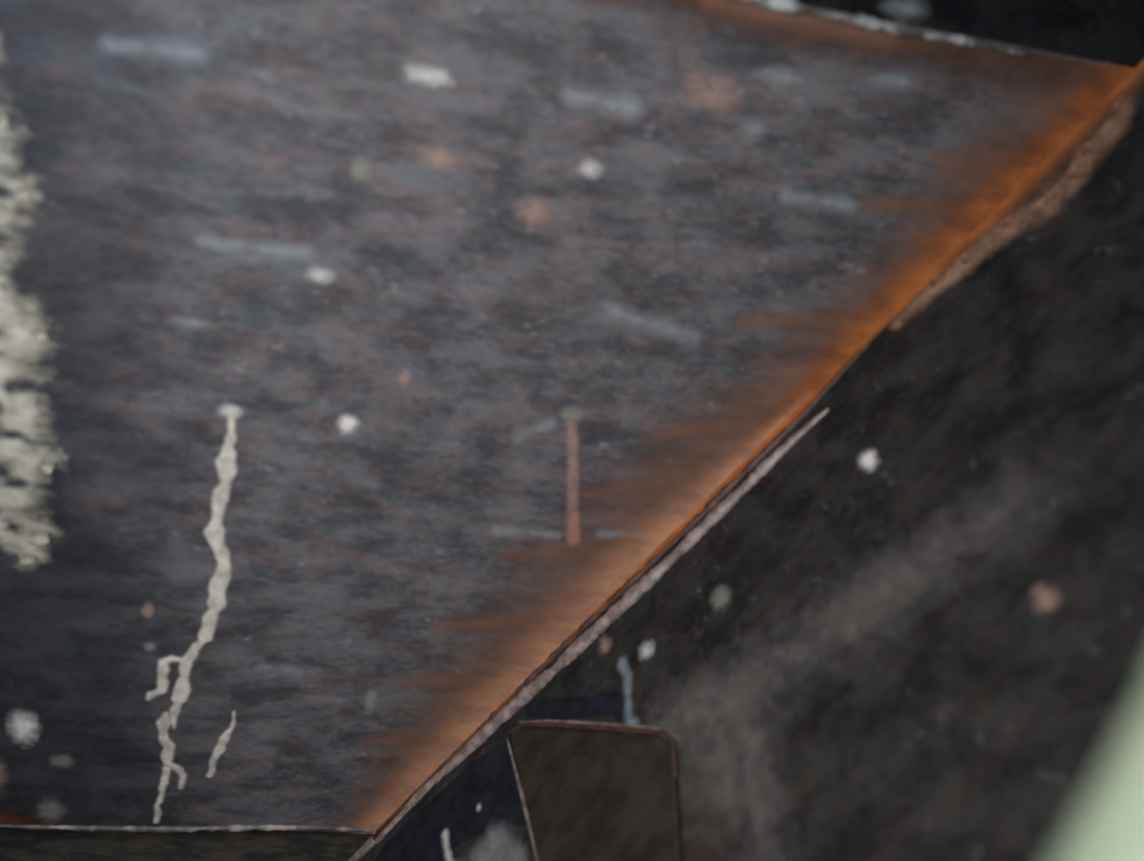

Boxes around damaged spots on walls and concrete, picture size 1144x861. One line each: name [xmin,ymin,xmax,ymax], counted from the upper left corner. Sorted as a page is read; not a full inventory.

crack [146,407,237,823]
rust [354,0,1144,834]